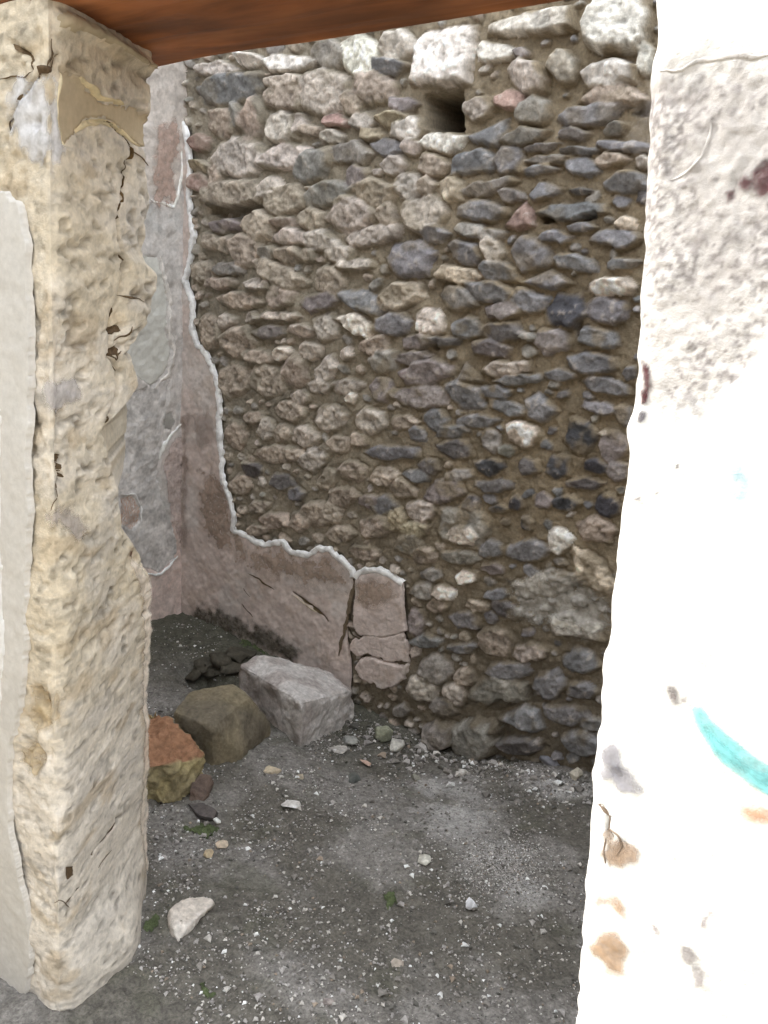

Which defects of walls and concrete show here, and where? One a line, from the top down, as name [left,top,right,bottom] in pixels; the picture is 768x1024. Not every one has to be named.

crack [1,39,58,131]
spalling [8,65,149,163]
crack [86,119,148,219]
flaking render [118,121,411,870]
crack [242,574,360,656]
water stain [602,830,638,867]
water stain [590,933,626,973]